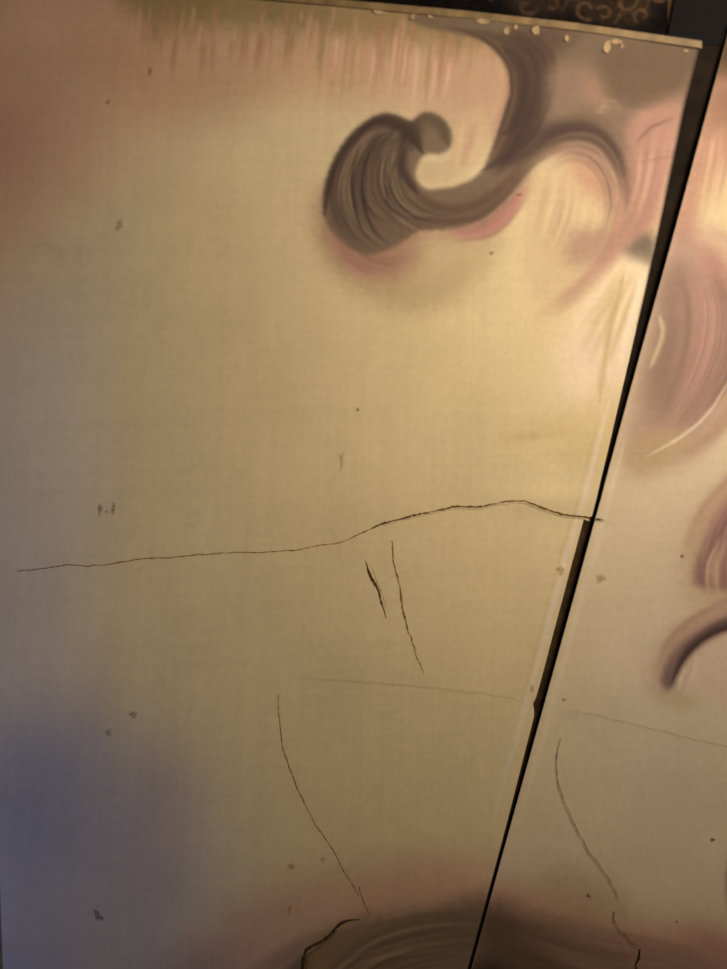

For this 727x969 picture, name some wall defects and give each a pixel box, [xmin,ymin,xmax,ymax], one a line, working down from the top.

peeling [604,39,625,53]
crack [17,500,603,674]
crack [278,696,370,915]
crack [556,739,641,969]